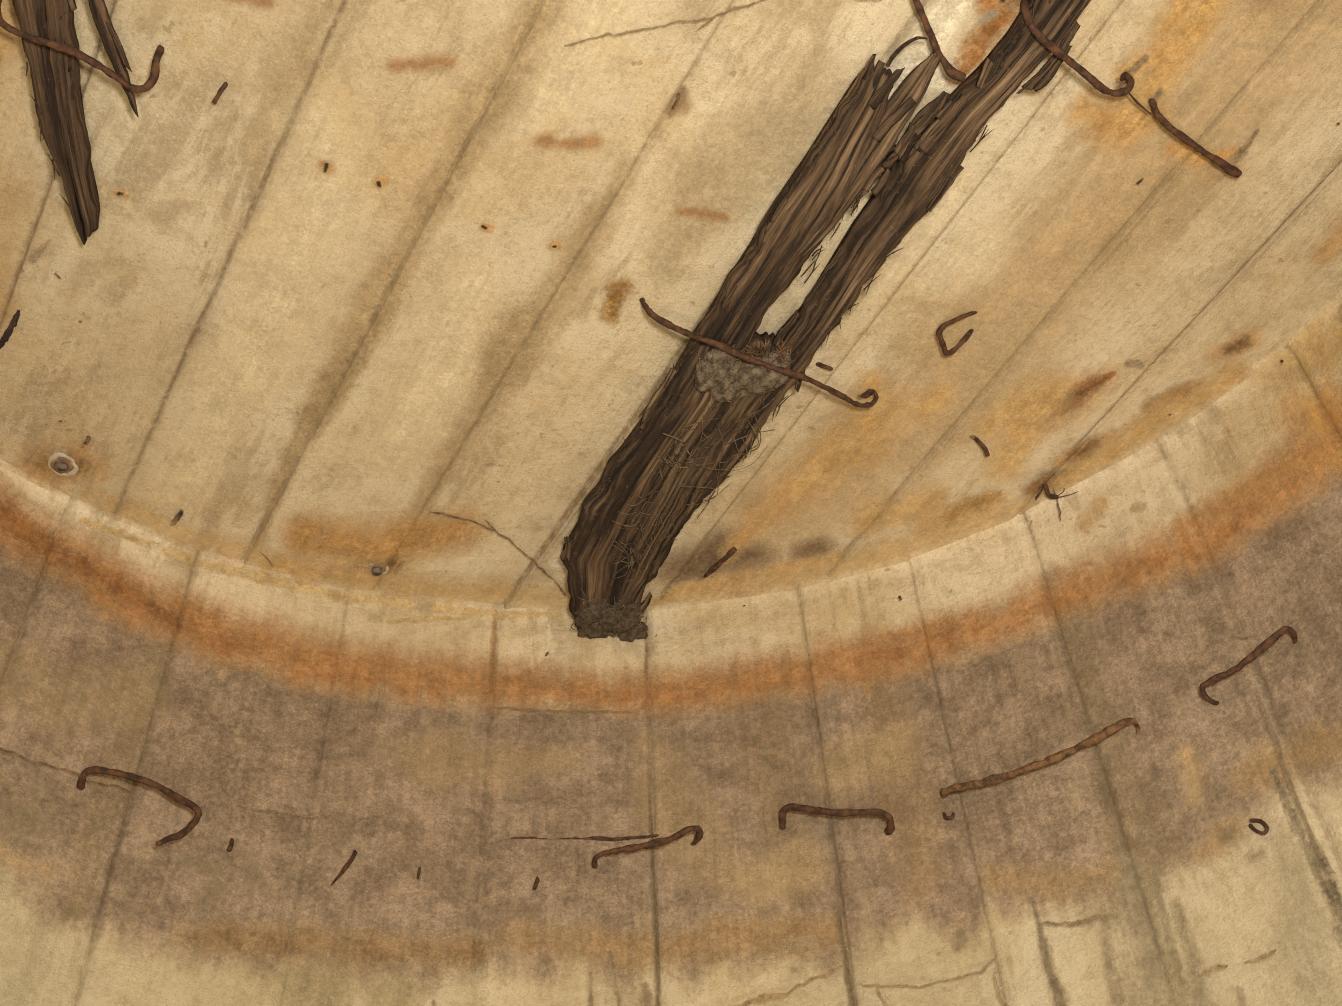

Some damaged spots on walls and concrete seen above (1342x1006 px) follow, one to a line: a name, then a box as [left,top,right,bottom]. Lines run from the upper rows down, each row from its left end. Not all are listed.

crack [564,0,763,46]
water stain [885,0,987,100]
rust [949,0,1021,84]
rust [1166,142,1238,168]
rust [600,279,633,324]
rust [0,317,1342,713]
water stain [0,470,1342,1006]